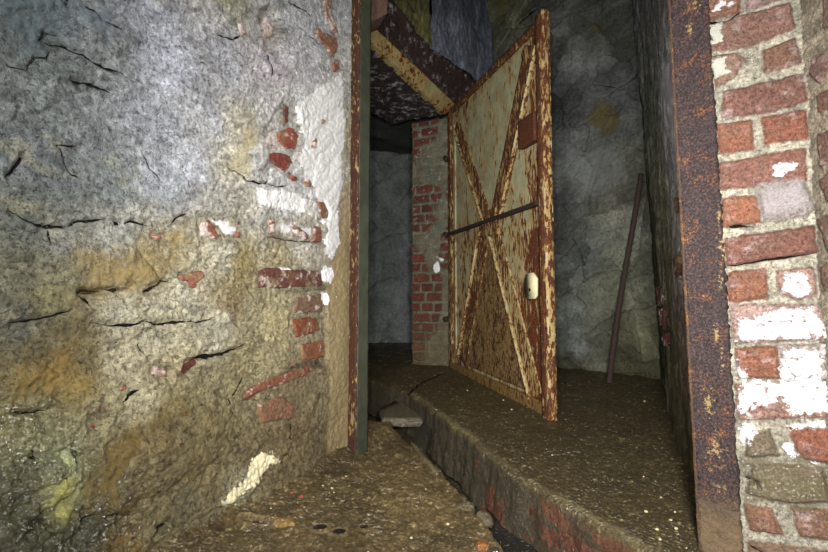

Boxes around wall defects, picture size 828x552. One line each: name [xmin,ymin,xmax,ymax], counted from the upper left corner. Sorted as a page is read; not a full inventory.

crack [7,32,124,93]
crack [5,157,21,177]
crack [56,145,79,178]
crack [9,211,146,243]
spalling [191,208,247,249]
peeling [234,0,349,454]
crack [142,280,168,292]
spalling [172,264,211,294]
crack [9,288,210,359]
crack [193,344,243,360]
damp [53,452,76,521]